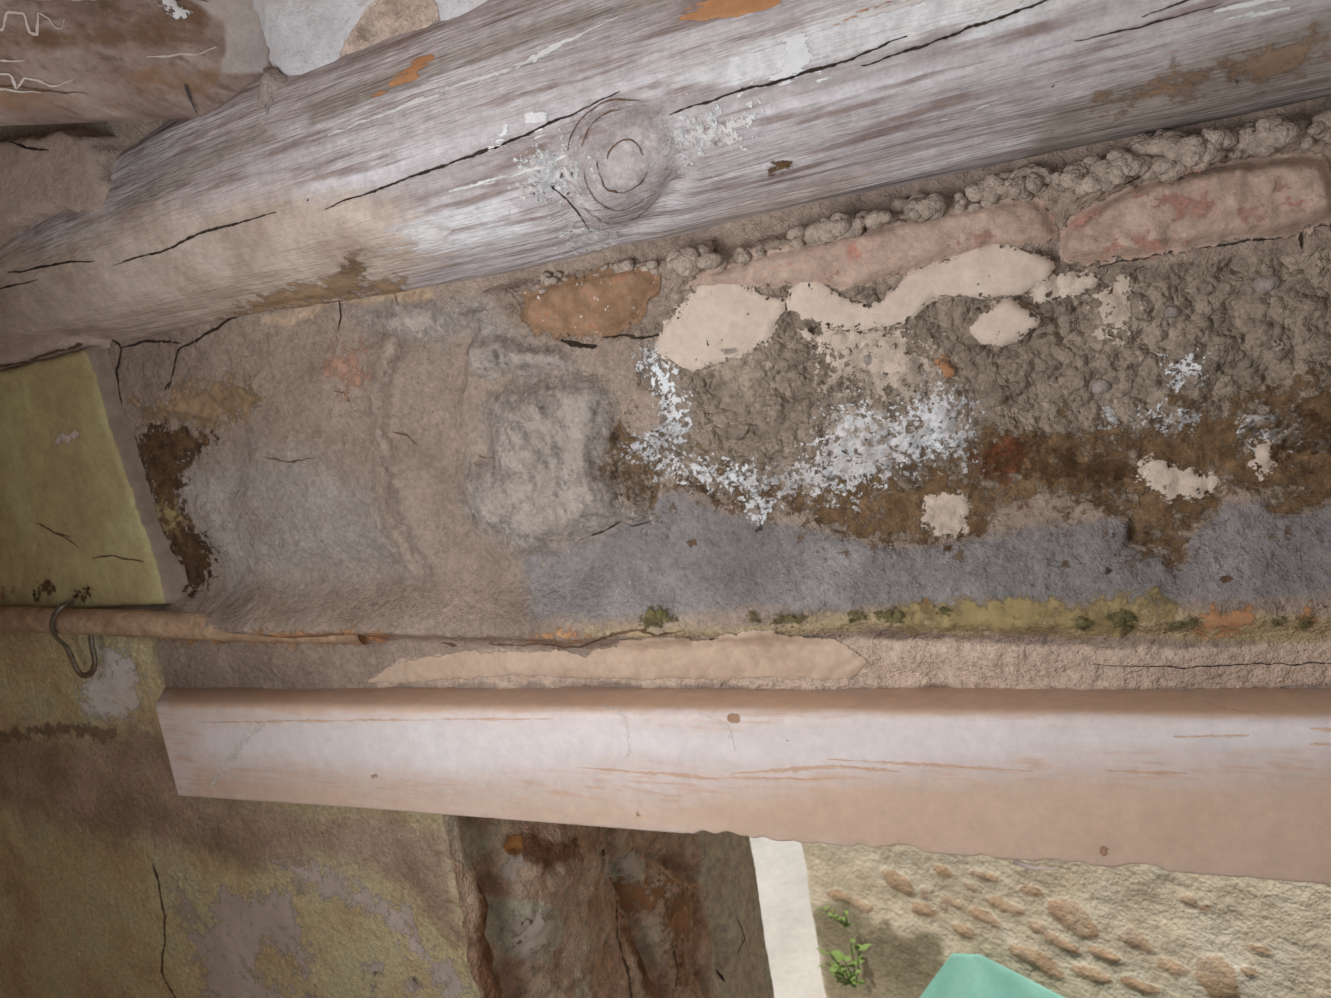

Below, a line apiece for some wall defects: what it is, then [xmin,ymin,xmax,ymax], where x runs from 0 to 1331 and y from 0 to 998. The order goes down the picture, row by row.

flaking render [1029,269,1146,347]
peeling [798,326,894,354]
leakage [596,314,1331,583]
leakage [637,604,679,630]
leakage [744,610,808,628]
leakage [847,586,1199,640]
leakage [1272,616,1315,632]
crack [146,853,176,998]